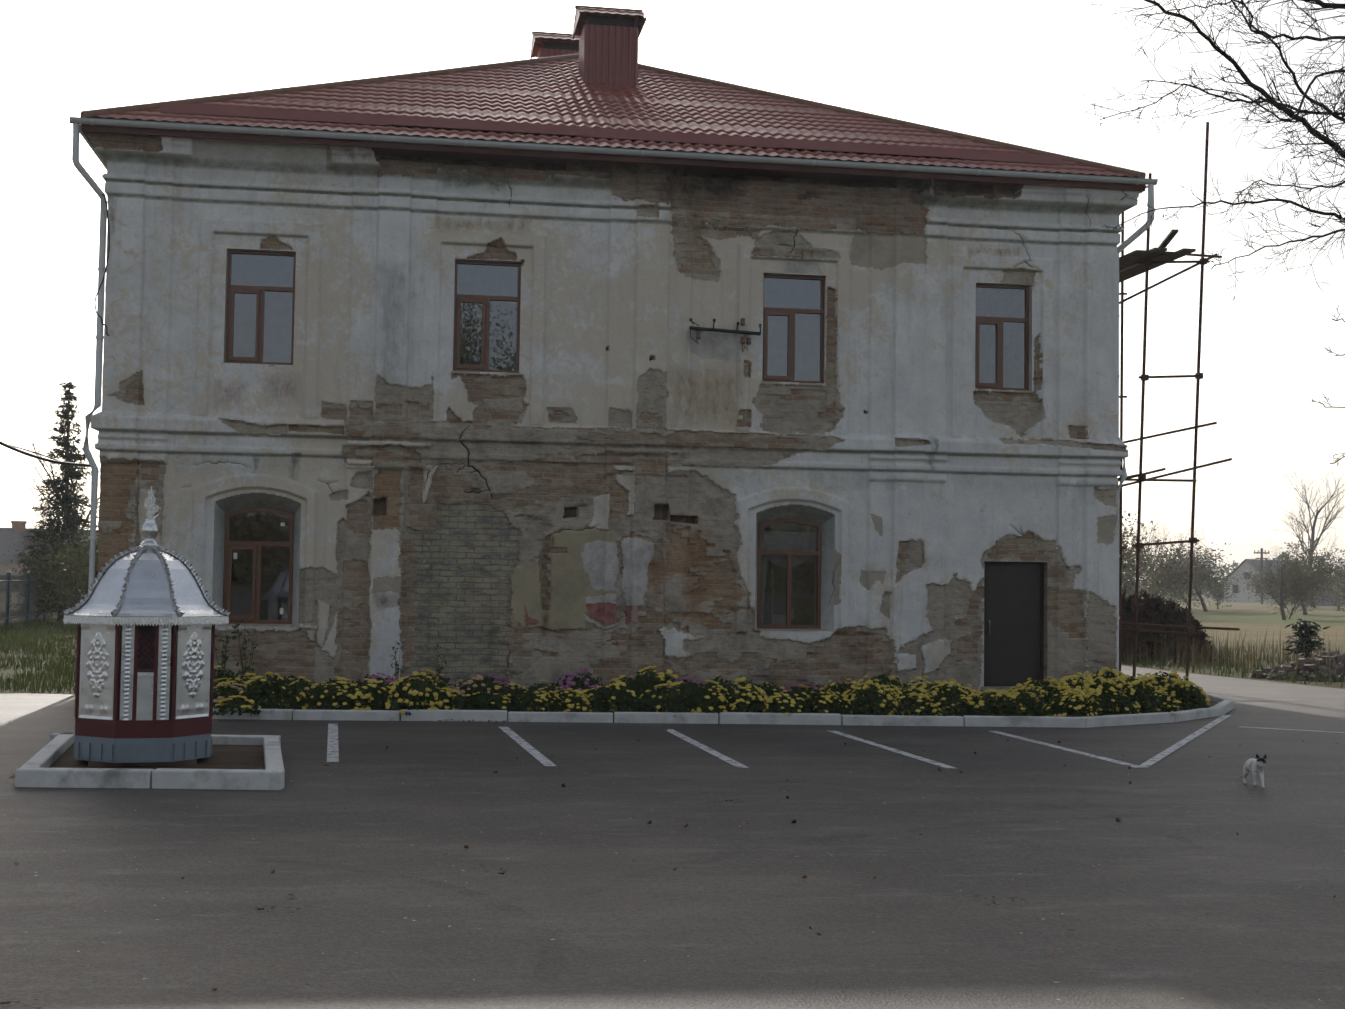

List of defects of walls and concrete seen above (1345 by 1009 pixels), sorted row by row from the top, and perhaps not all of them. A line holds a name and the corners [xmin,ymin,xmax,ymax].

spalling [371,148,1024,283]
spalling [109,370,145,405]
spalling [98,456,166,573]
crack [424,425,492,498]
spalling [214,287,1090,690]
peeling [1093,487,1118,545]